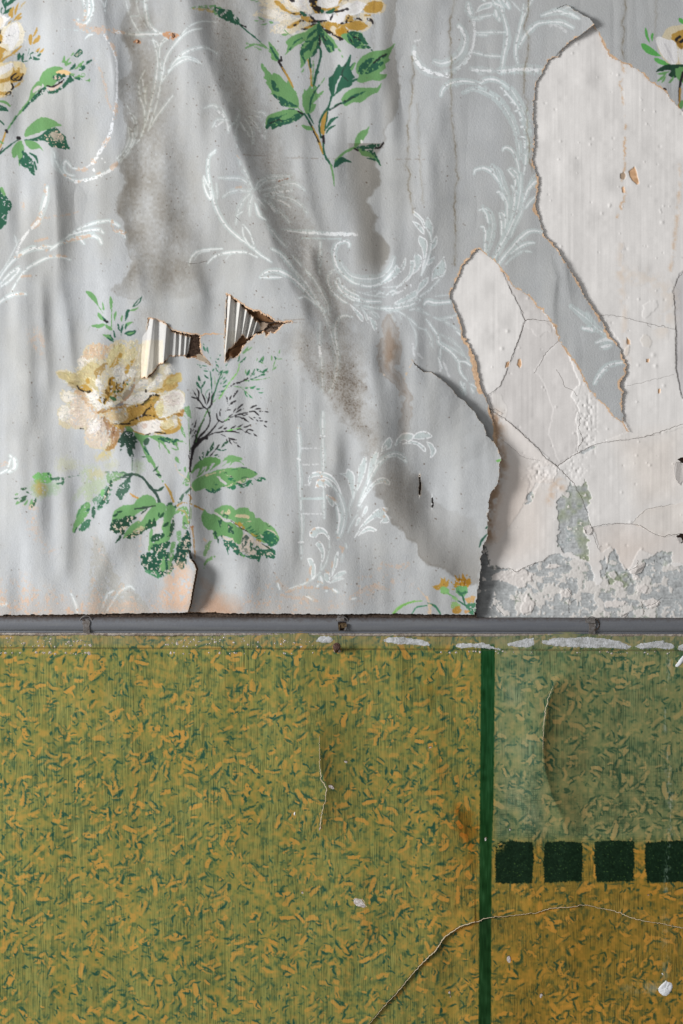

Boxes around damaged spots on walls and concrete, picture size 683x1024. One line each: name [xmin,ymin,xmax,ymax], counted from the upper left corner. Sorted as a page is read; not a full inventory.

damp [109,0,219,303]
damp [343,0,424,280]
spalling [620,166,639,193]
peeling [340,365,683,618]
peeling [495,261,630,431]
crack [488,278,682,548]
crack [319,737,327,829]
crack [369,905,681,1024]